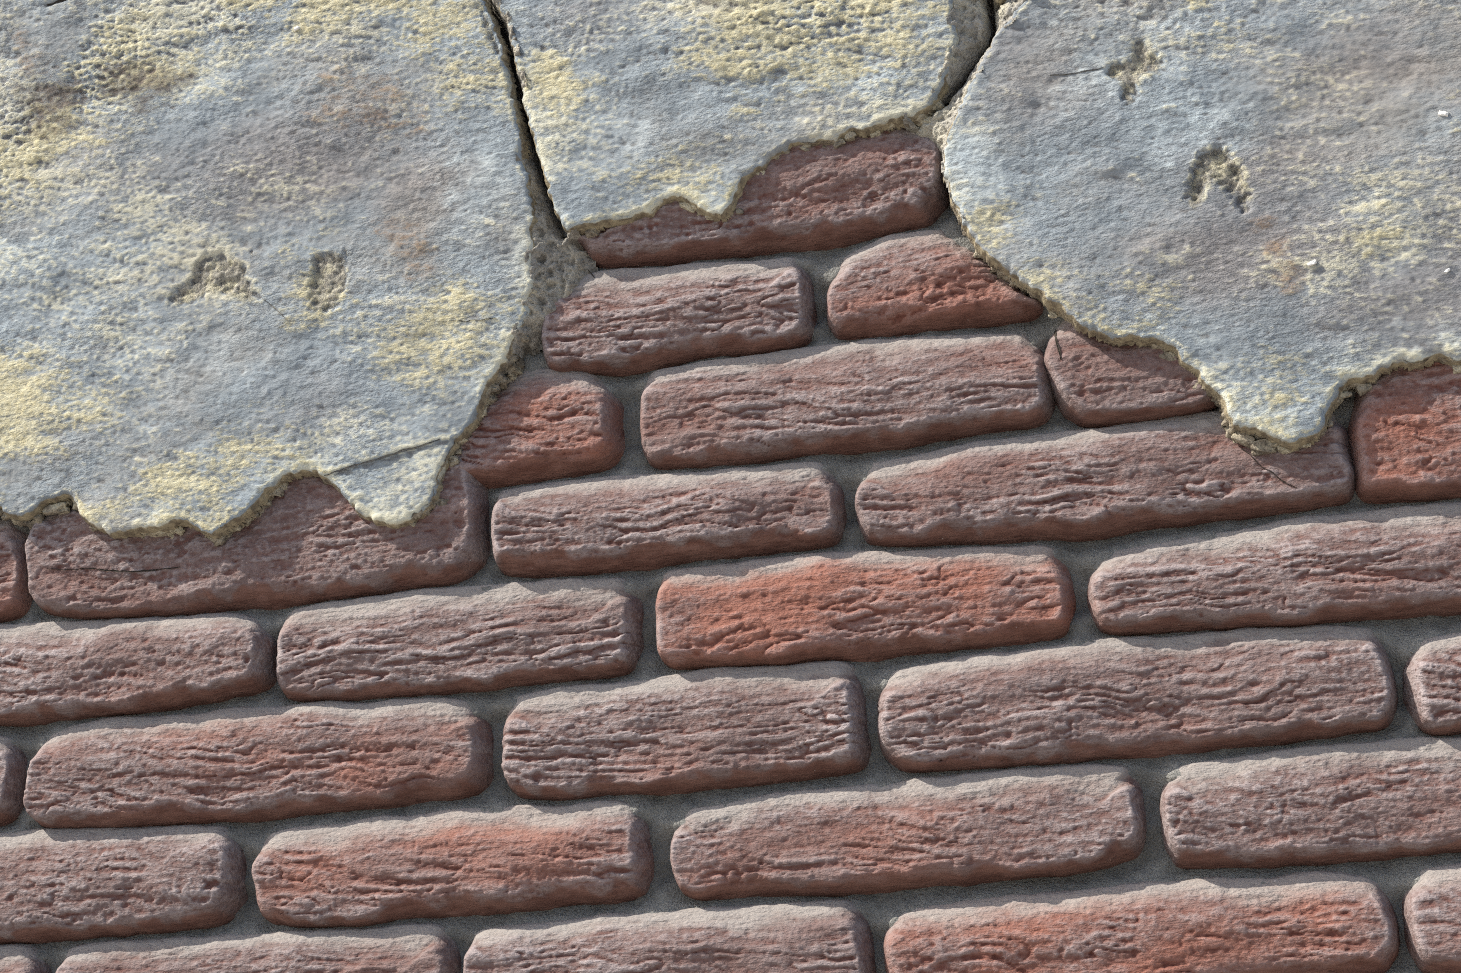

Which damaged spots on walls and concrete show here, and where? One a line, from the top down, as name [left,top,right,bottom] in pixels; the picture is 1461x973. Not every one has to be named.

spalling [756,99,946,175]
crack [903,0,1026,219]
crack [437,0,598,359]
spalling [1185,150,1249,207]
spalling [171,254,252,304]
spalling [309,253,345,309]
spalling [952,209,1177,361]
spalling [408,312,530,527]
spalling [1192,374,1383,456]
spalling [0,496,99,532]